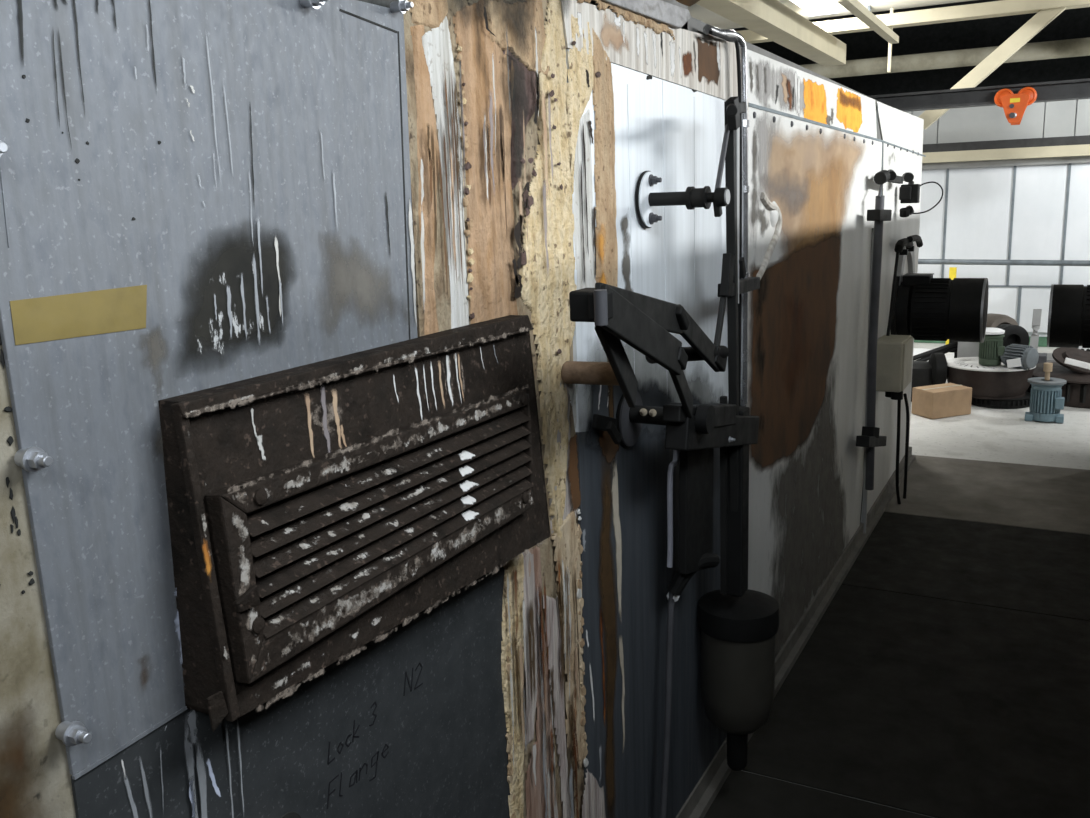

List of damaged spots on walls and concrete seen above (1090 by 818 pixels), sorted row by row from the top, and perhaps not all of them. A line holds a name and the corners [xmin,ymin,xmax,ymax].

damp [206,36,233,188]
damp [321,133,338,227]
damp [214,106,283,342]
peeling [185,393,273,417]
peeling [285,0,618,818]
peeling [228,477,268,499]
peeling [233,515,250,596]
peeling [247,608,258,630]
peeling [257,661,324,711]